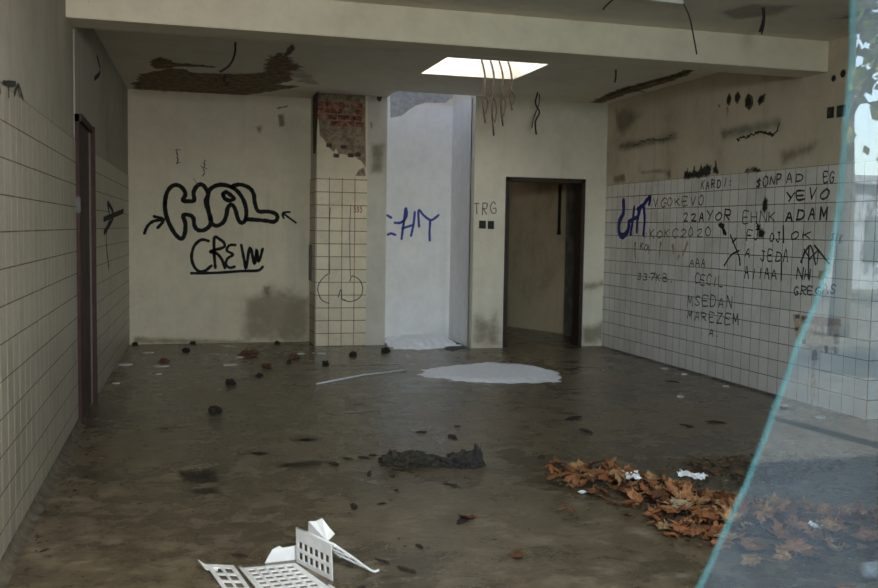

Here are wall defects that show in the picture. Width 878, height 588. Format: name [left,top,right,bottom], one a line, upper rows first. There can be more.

flaking render [131,44,303,95]
flaking render [377,91,453,118]
flaking render [313,92,366,176]